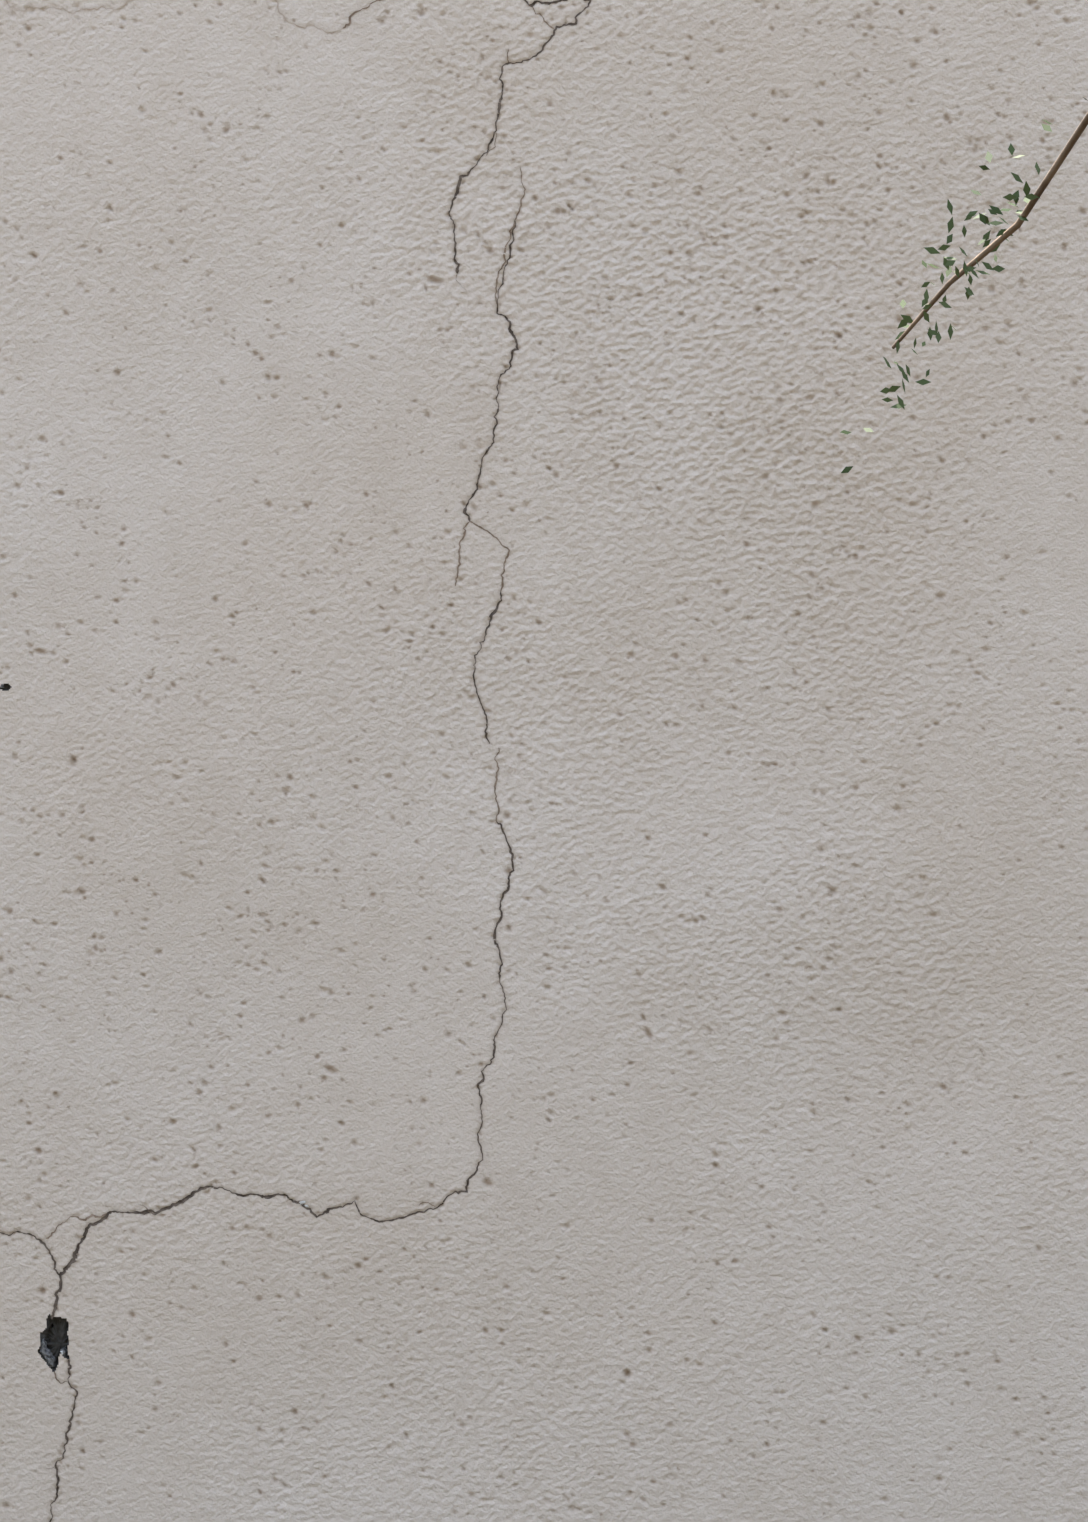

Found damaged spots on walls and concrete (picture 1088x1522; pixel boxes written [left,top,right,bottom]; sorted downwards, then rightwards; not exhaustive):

crack [0,0,591,1319]
spalling [38,1314,70,1372]
crack [48,1359,78,1522]